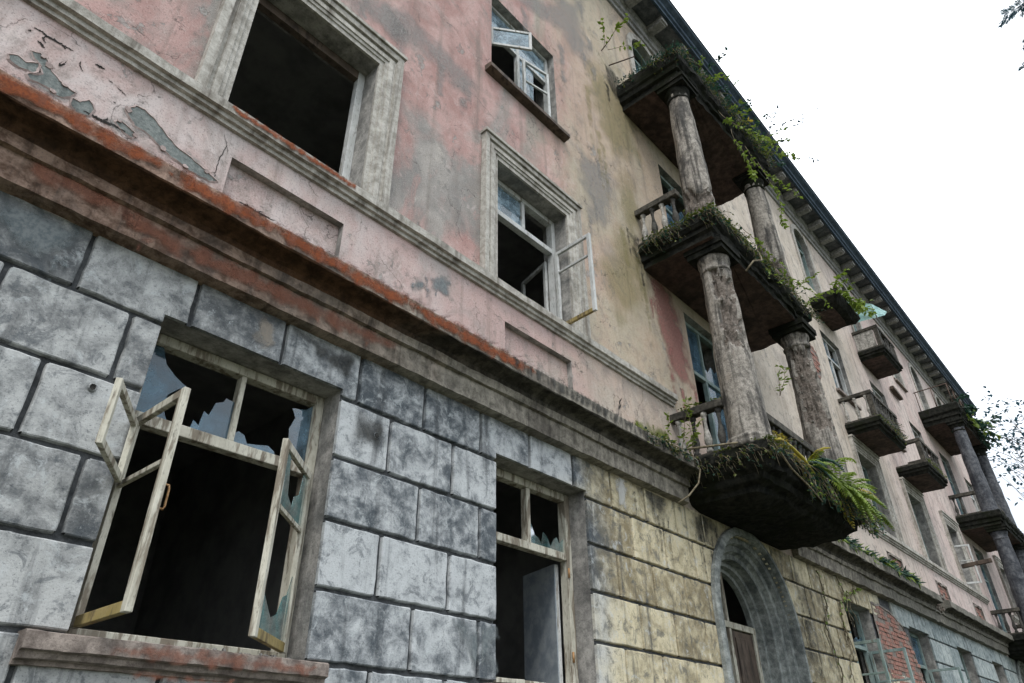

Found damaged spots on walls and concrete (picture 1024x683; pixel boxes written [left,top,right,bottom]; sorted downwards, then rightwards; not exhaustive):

spalling [6,29,96,118]
crack [35,27,73,51]
spalling [95,63,218,183]
corrosion [0,72,536,373]
flaking render [870,601,925,683]